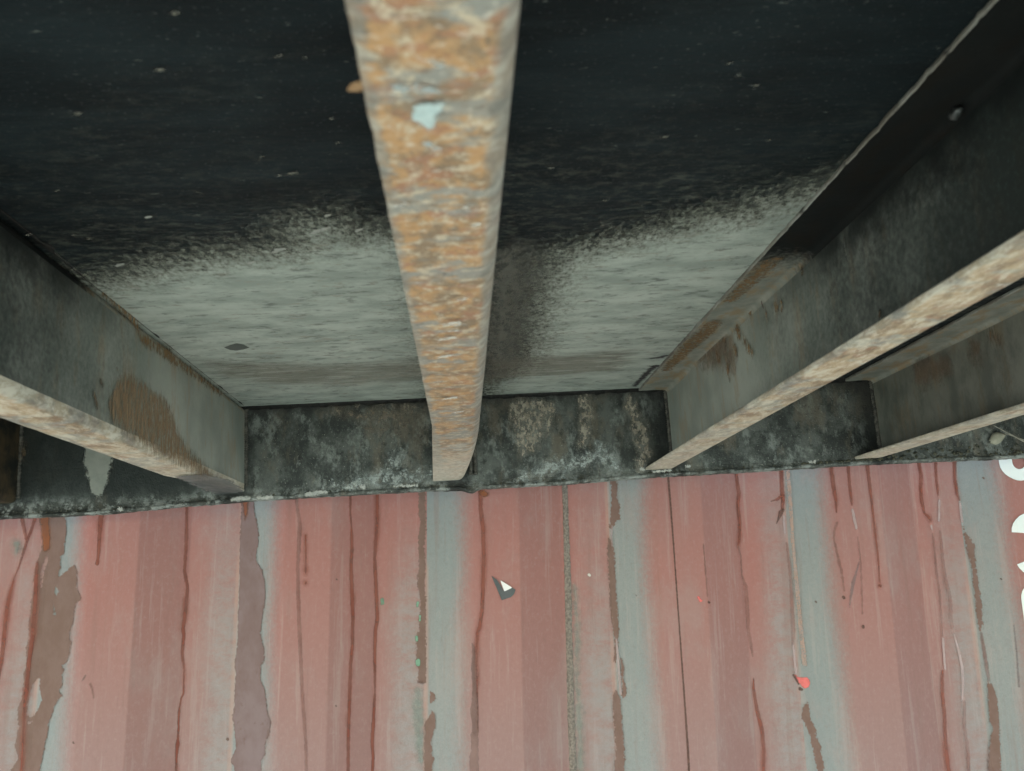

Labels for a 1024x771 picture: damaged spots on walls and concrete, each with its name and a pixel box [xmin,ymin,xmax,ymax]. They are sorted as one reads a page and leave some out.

leakage [484,246,535,383]
leakage [509,398,555,456]
leakage [519,394,619,479]
leakage [623,355,668,468]
peeling [11,517,81,771]
peeling [226,495,274,771]
rust [347,496,355,771]
rust [371,494,379,771]
peeling [607,481,627,771]
peeling [801,702,825,771]
rust [953,461,987,664]
rust [987,682,1002,771]